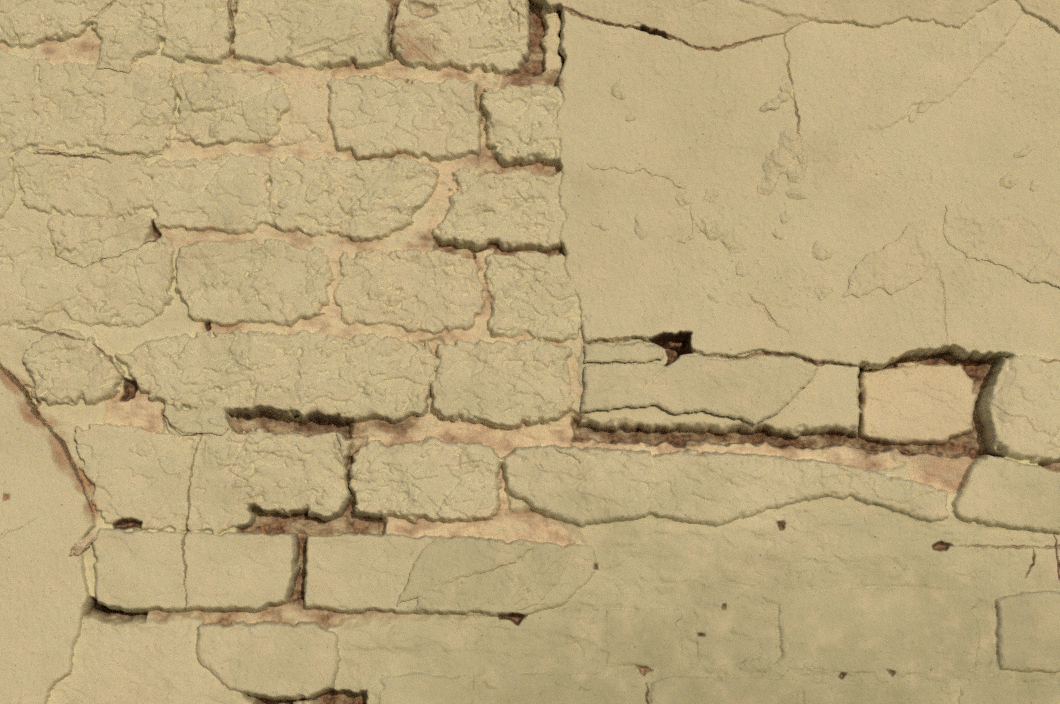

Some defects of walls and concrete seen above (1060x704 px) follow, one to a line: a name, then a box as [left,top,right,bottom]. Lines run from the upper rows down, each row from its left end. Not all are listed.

crack [552,5,800,134]
crack [18,327,123,377]
spalling [581,342,818,426]
peeling [397,535,571,616]
crack [951,532,1060,580]